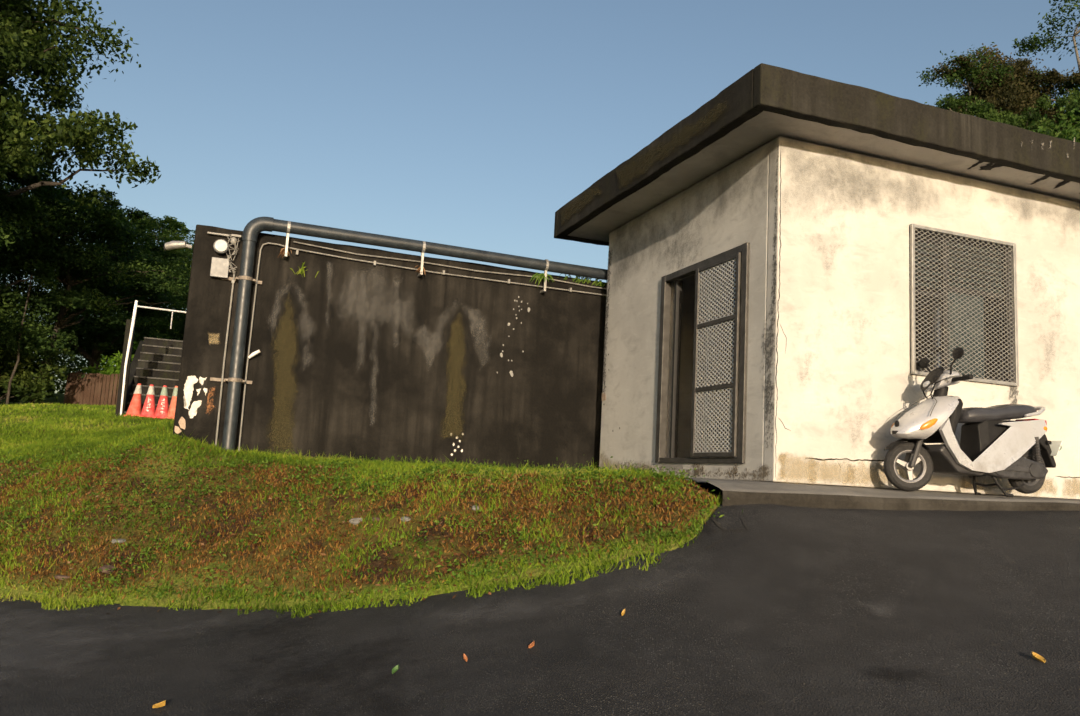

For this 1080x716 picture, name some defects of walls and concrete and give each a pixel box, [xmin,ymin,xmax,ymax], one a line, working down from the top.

peeling [174,376,207,434]